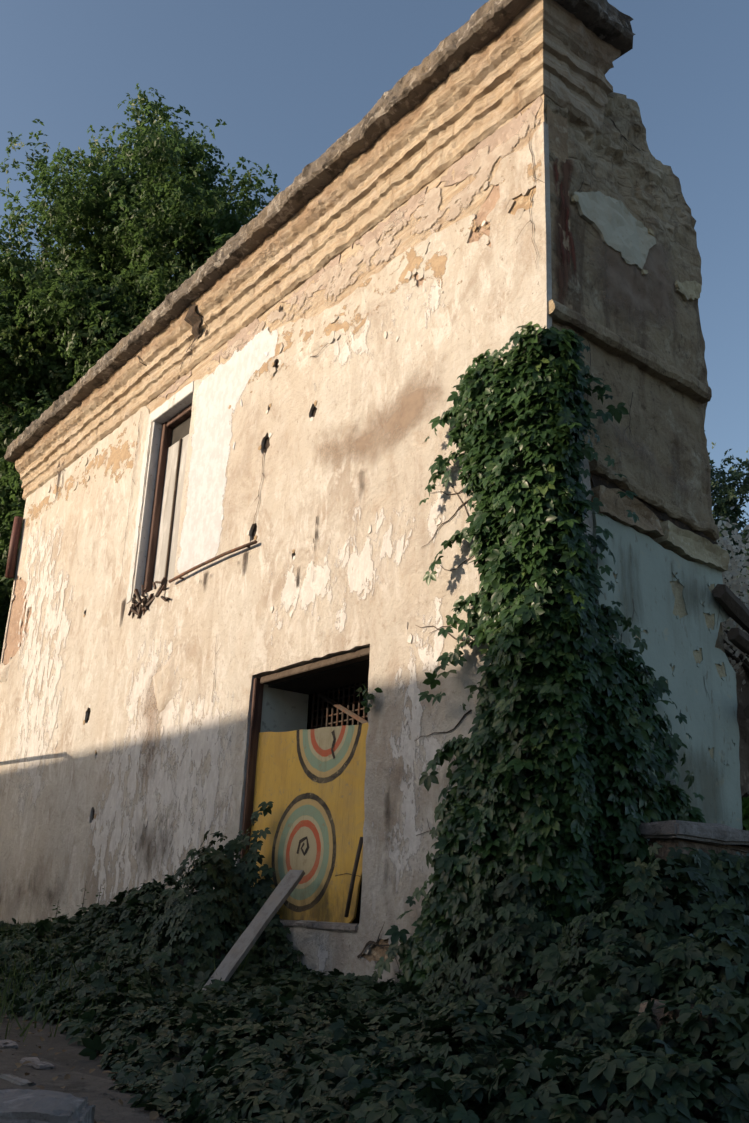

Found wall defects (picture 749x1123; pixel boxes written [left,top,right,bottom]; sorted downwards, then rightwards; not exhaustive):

corrosion [553,158,577,305]
flaking render [146,94,544,574]
damp [324,386,437,459]
peeling [269,479,460,645]
peeling [372,596,446,893]